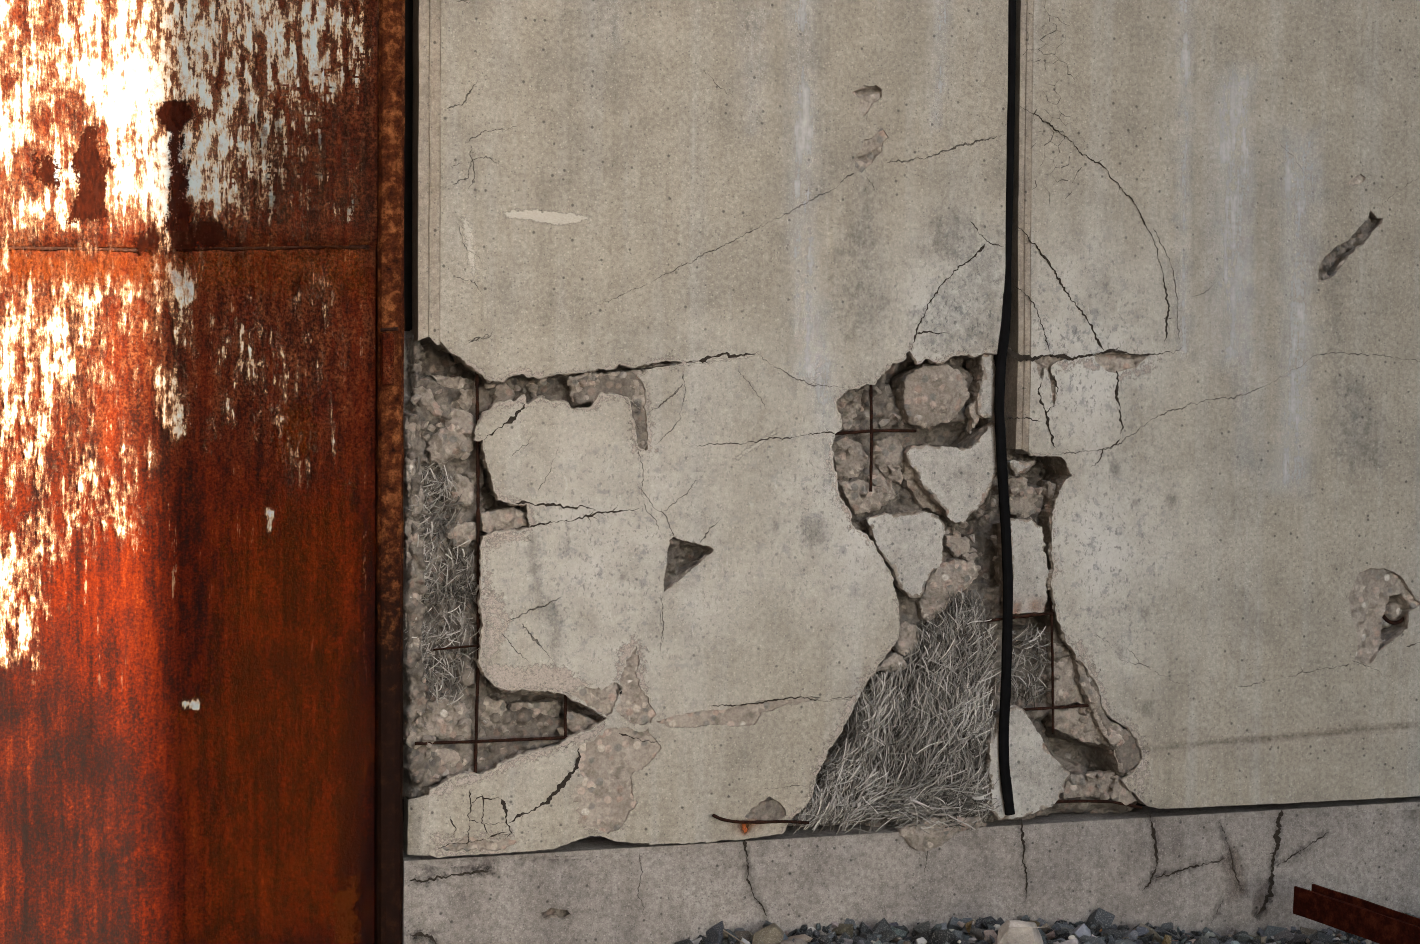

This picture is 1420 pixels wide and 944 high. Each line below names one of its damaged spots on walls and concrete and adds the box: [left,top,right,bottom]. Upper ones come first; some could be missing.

spalling [853,86,881,116]
corrosion [31,126,115,227]
corrosion [132,98,371,258]
crack [447,80,516,343]
crack [599,1,1420,466]
spalling [1318,215,1377,280]
spalling [402,329,816,834]
spalling [745,344,1161,835]
spalling [1348,568,1419,664]
crack [1238,660,1382,687]
spalling [430,830,516,857]
crack [1144,810,1328,923]